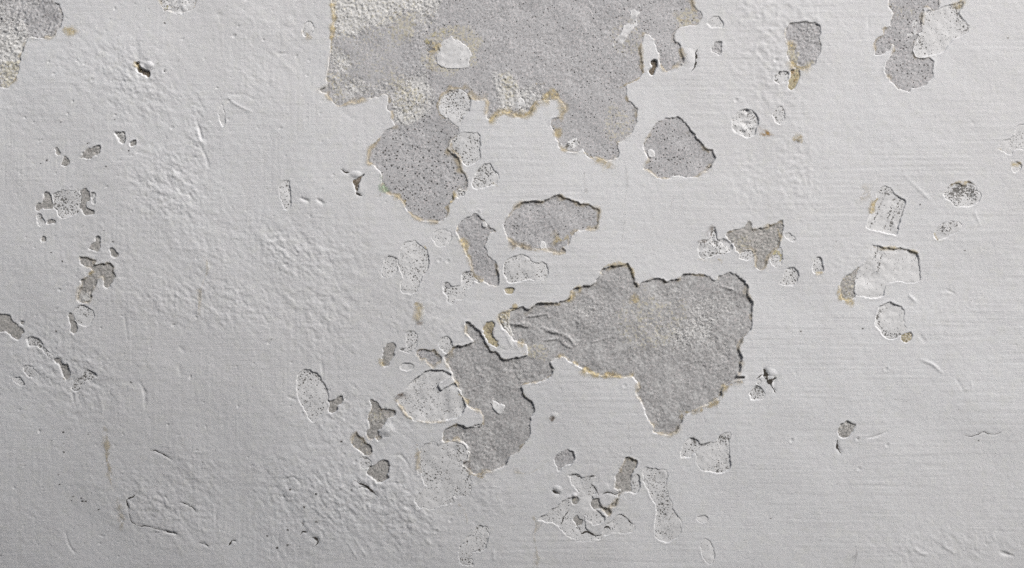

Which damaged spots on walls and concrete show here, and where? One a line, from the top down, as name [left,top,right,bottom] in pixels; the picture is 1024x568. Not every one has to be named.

peeling [0,0,63,88]
peeling [785,22,821,90]
peeling [874,0,939,92]
peeling [320,0,702,223]
peeling [644,117,715,179]
flaking render [80,188,94,215]
peeling [77,236,118,303]
peeling [726,221,783,270]
peeling [0,314,24,340]
peeling [416,195,752,478]
flaking render [329,396,343,413]
peeling [591,457,640,515]